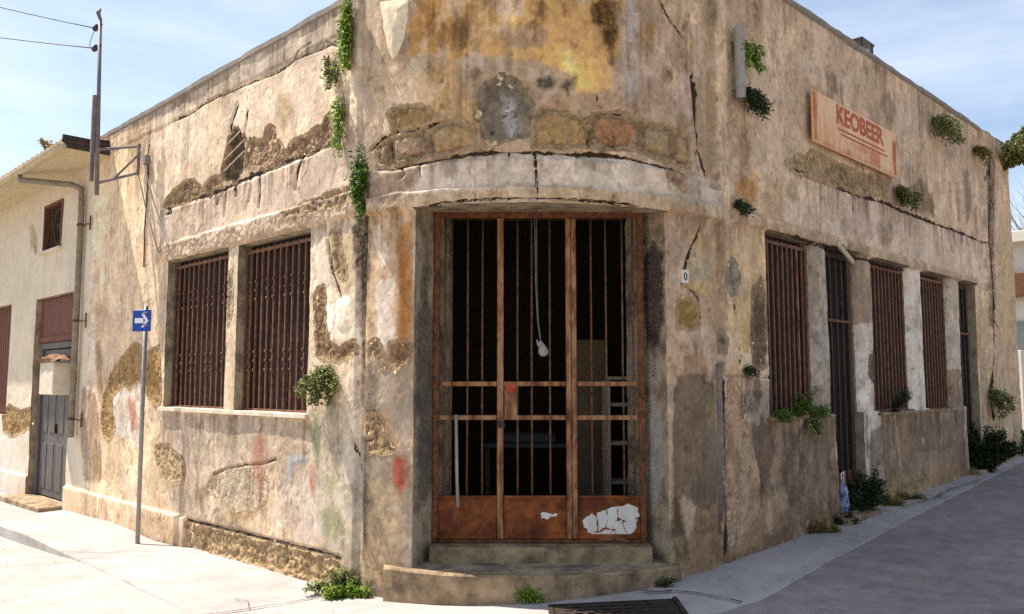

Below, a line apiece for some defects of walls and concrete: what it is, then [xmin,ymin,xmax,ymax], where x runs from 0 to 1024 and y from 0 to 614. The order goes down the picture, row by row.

flaking render [162,111,333,209]
flaking render [374,72,692,194]
crack [374,72,705,208]
damp [538,76,574,95]
flaking render [313,284,413,375]
damp [643,243,664,353]
crack [681,226,701,326]
crack [787,161,998,420]
flaking render [2,404,34,438]
flaking render [100,341,162,443]
flaking render [153,443,186,486]
flaking render [184,520,342,586]